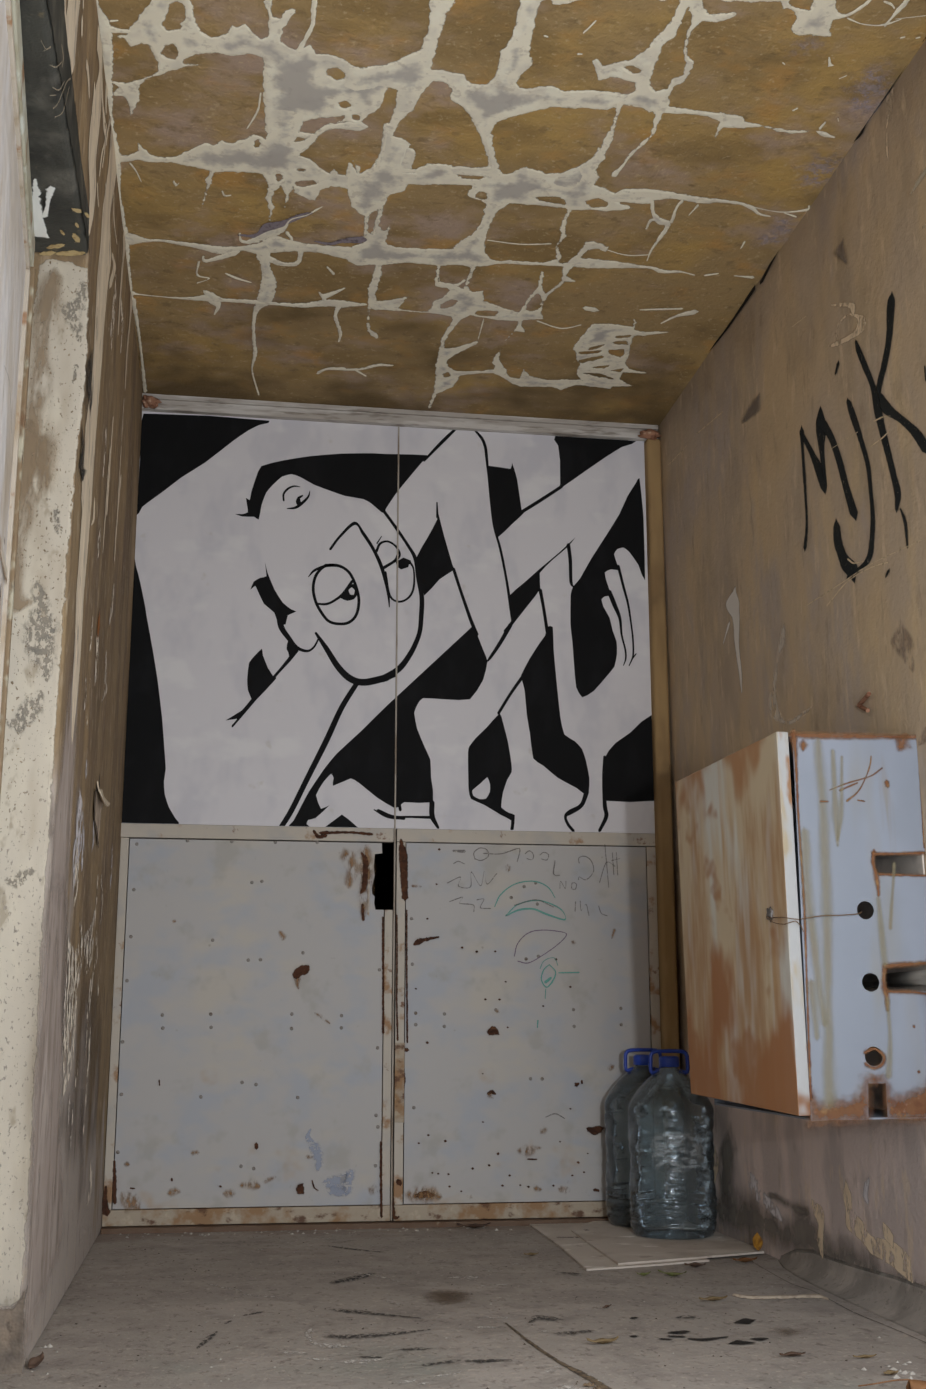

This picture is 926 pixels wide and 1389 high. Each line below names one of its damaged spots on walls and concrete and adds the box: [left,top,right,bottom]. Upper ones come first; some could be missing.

flaking render [64,0,84,73]
flaking render [722,0,926,37]
flaking render [71,0,810,742]
flaking render [0,244,89,1374]
corrosion [313,830,373,921]
corrosion [382,839,439,1052]
flaking render [62,876,103,1148]
corrosion [586,1126,604,1135]
corrosion [102,1160,139,1216]
corrosion [379,1141,462,1220]
flaking render [812,1200,824,1258]
flaking render [843,1180,913,1283]